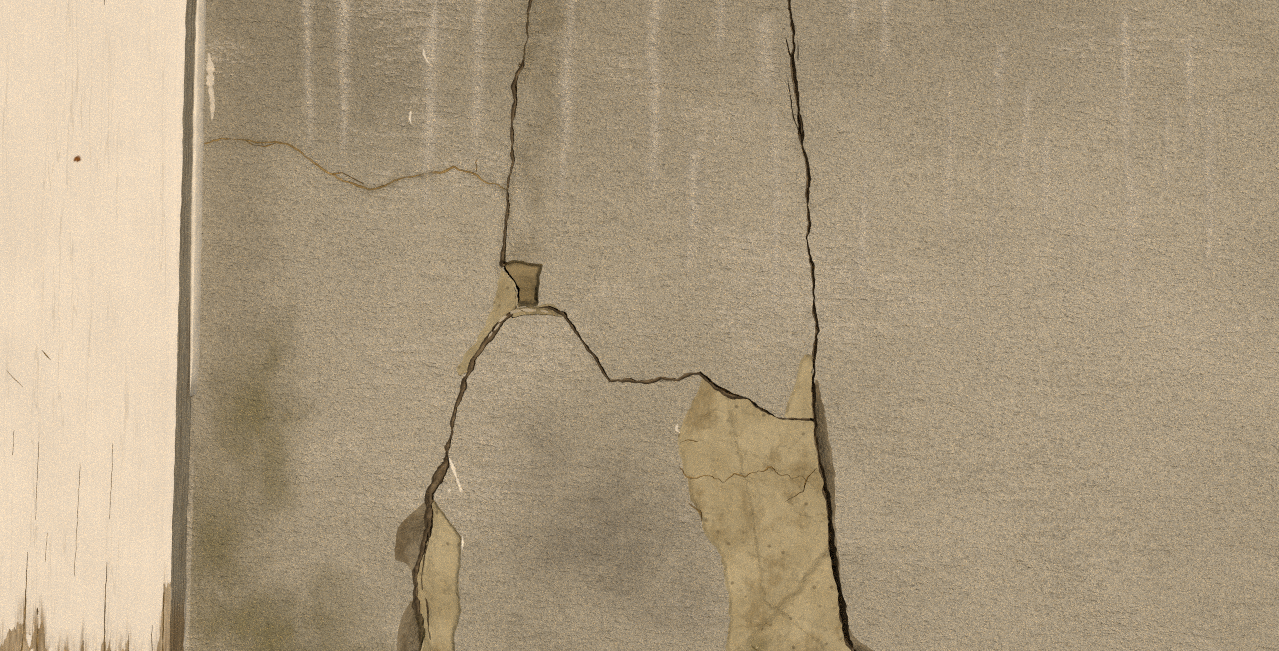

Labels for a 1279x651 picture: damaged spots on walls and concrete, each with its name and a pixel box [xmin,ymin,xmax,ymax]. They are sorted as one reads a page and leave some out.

leakage [339,0,348,137]
crack [204,0,533,268]
leakage [425,0,438,180]
flaking render [456,260,563,375]
crack [412,0,856,651]
peeling [0,608,134,651]
peeling [156,582,171,651]
flaking render [394,500,464,651]
flaking render [675,354,873,651]